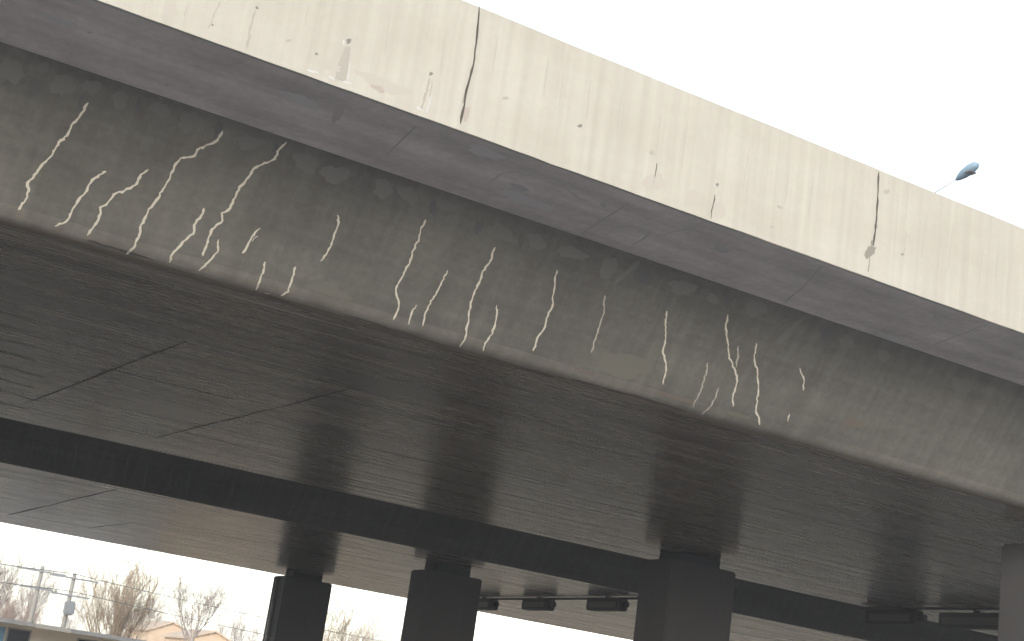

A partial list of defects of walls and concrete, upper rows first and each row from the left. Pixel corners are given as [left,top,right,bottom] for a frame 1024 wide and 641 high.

crack [460,6,480,124]
crack [18,103,88,210]
crack [55,131,223,255]
crack [169,142,296,296]
crack [321,215,340,261]
crack [393,220,448,326]
crack [459,247,498,351]
crack [533,271,558,351]
crack [591,295,606,353]
crack [660,311,668,383]
crack [693,315,760,425]
crack [868,172,879,272]